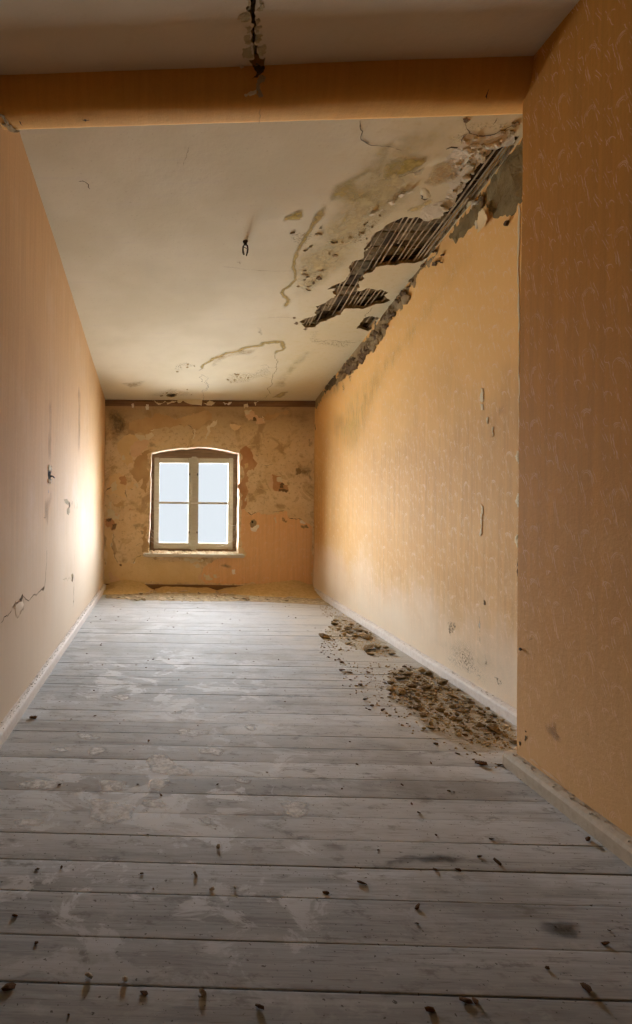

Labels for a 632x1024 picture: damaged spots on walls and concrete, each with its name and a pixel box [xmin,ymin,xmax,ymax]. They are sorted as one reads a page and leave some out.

leakage [280,158,425,306]
flaking render [290,121,523,409]
leakage [201,341,285,369]
flaking render [268,474,289,493]
crack [1,563,47,623]